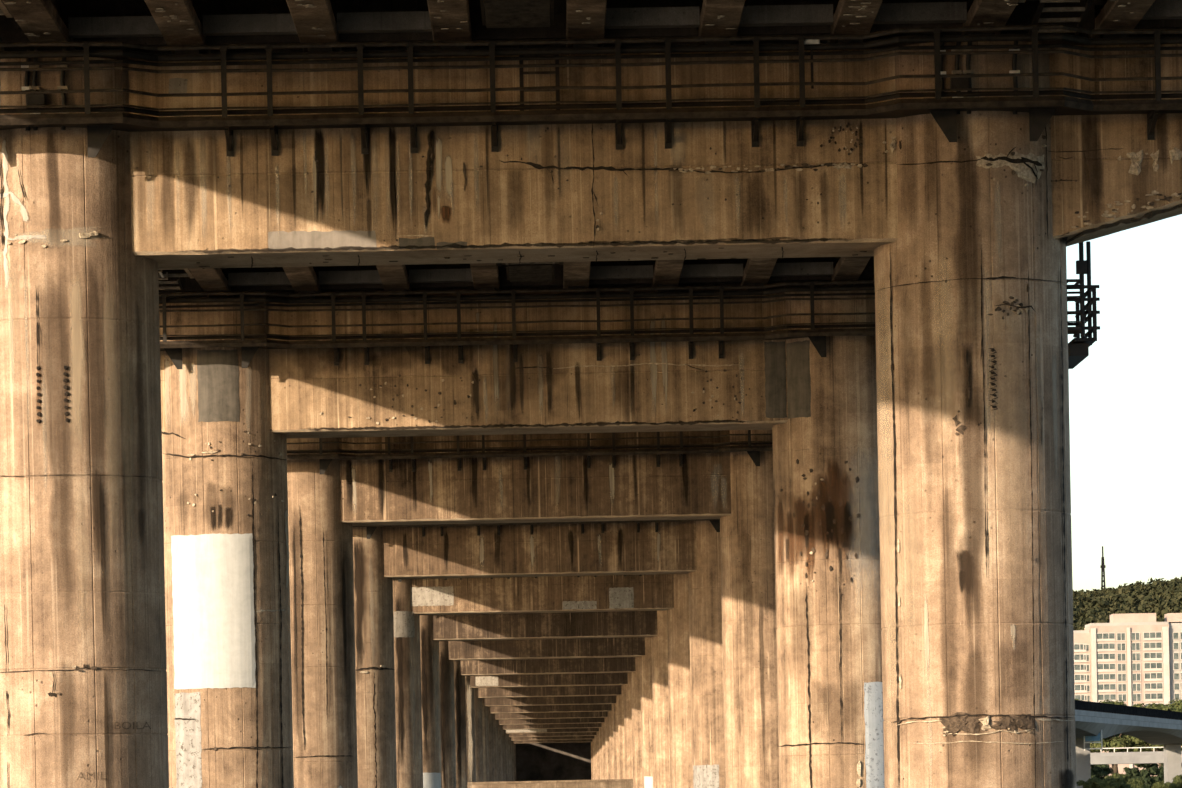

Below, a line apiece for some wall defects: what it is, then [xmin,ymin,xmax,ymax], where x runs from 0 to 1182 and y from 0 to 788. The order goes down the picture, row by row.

leakage [0,137,58,287]
leakage [424,130,467,227]
crack [499,124,689,262]
leakage [958,132,978,336]
spalling [976,135,1078,186]
peeling [1118,147,1182,176]
leakage [37,298,67,556]
leakage [92,475,106,630]
leakage [256,511,301,712]
leakage [826,502,851,573]
leakage [959,390,982,594]
spalling [939,712,1036,737]